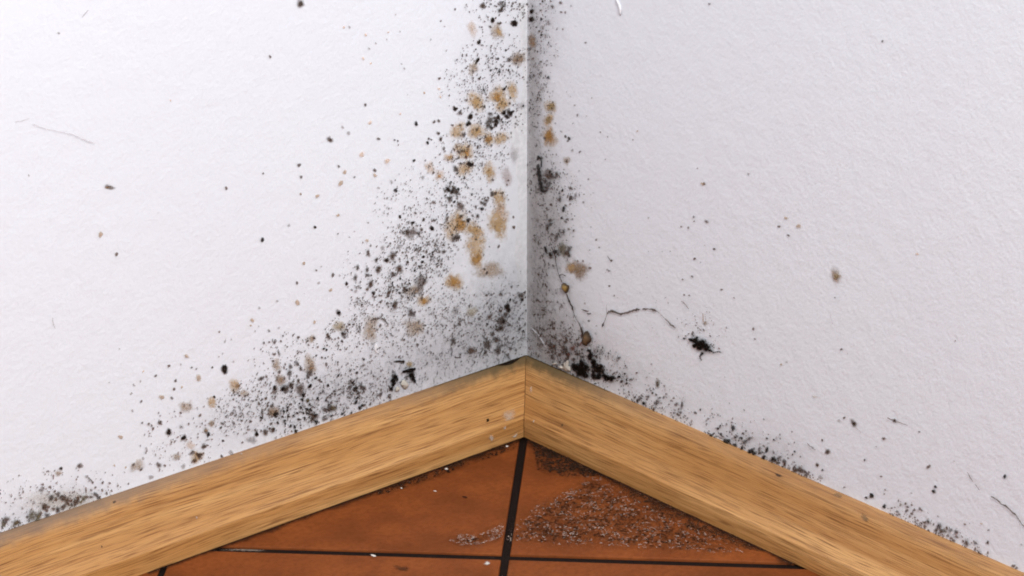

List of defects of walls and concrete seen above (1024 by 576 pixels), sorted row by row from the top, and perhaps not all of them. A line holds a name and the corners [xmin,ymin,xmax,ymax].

damp [0,0,824,530]
crack [554,253,675,336]
damp [516,482,724,551]
damp [865,476,989,557]